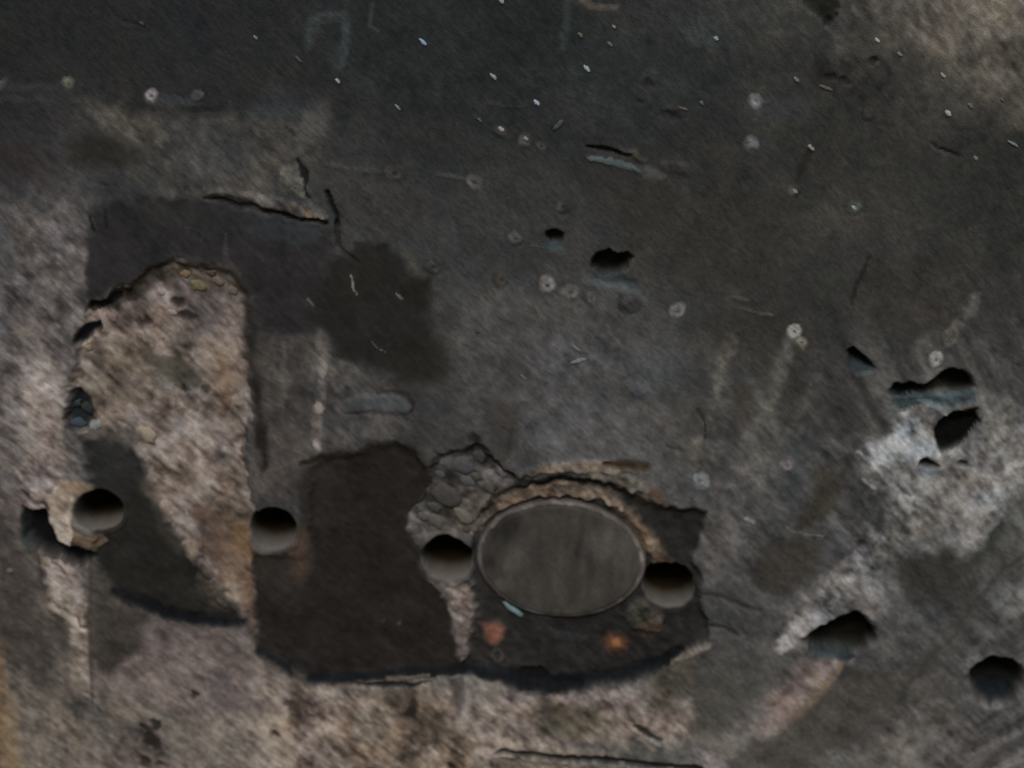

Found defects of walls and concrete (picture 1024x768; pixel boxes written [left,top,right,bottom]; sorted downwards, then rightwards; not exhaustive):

crack [203,126,359,264]
damp [309,239,456,448]
spalling [14,195,714,704]
spalling [886,366,979,480]
damp [770,383,1024,658]
spalling [802,610,878,663]
spalling [965,655,1024,708]